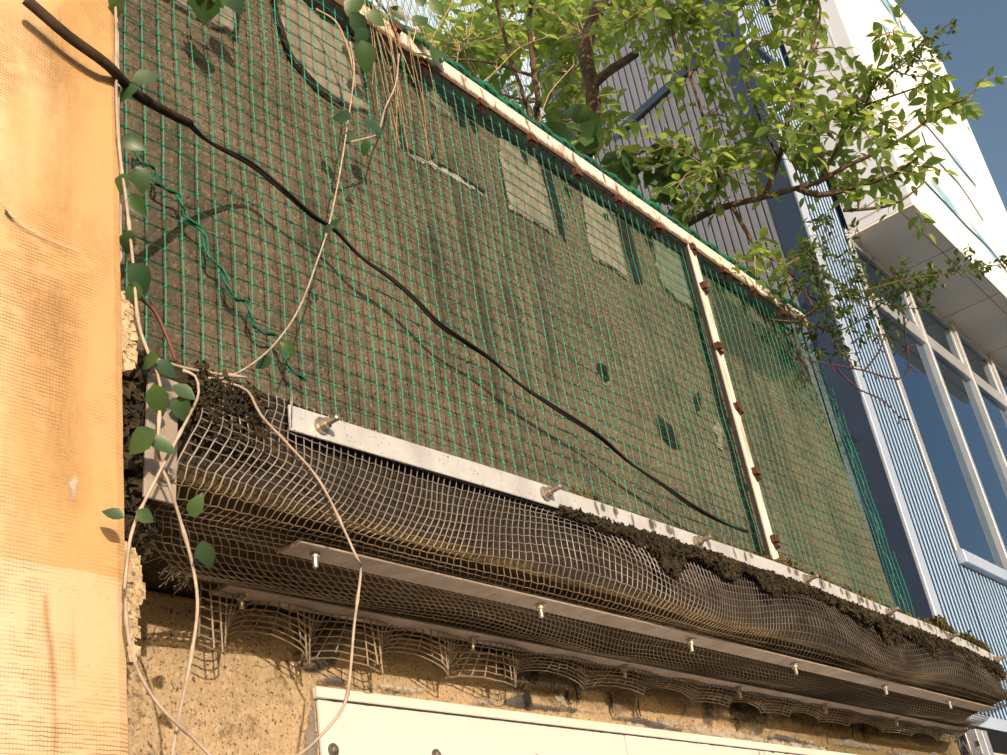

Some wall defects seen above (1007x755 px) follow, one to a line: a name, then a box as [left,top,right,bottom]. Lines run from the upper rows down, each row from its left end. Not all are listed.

flaking render [499,138,567,242]
flaking render [582,194,643,284]
flaking render [654,240,700,311]
spalling [704,696,768,735]